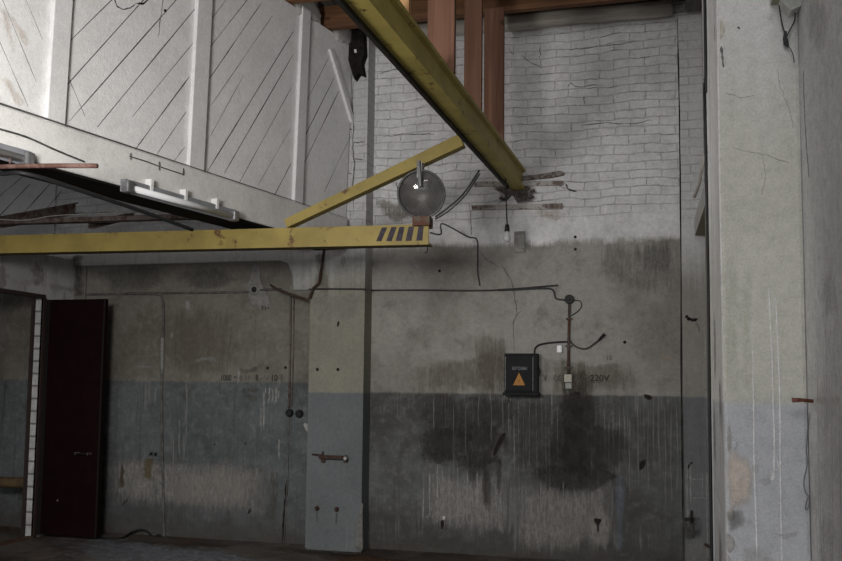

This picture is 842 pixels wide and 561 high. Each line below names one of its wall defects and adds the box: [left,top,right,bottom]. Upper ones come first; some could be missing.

spalling [471,171,564,210]